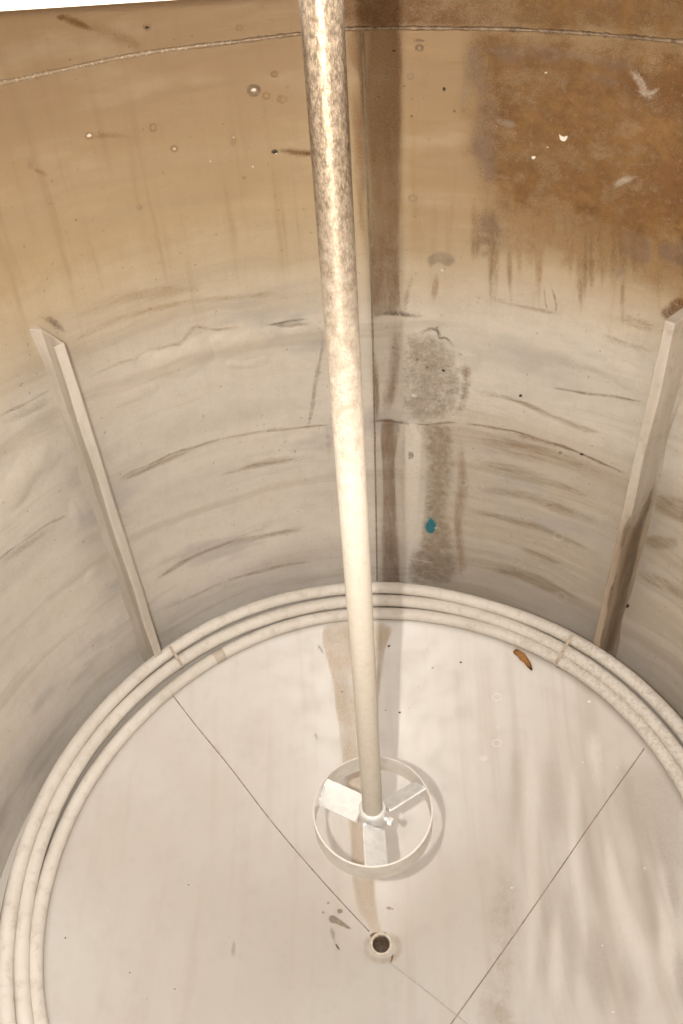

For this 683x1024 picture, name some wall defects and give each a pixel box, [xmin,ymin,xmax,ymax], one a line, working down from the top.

water stain [347,21,455,583]
rust [454,16,683,321]